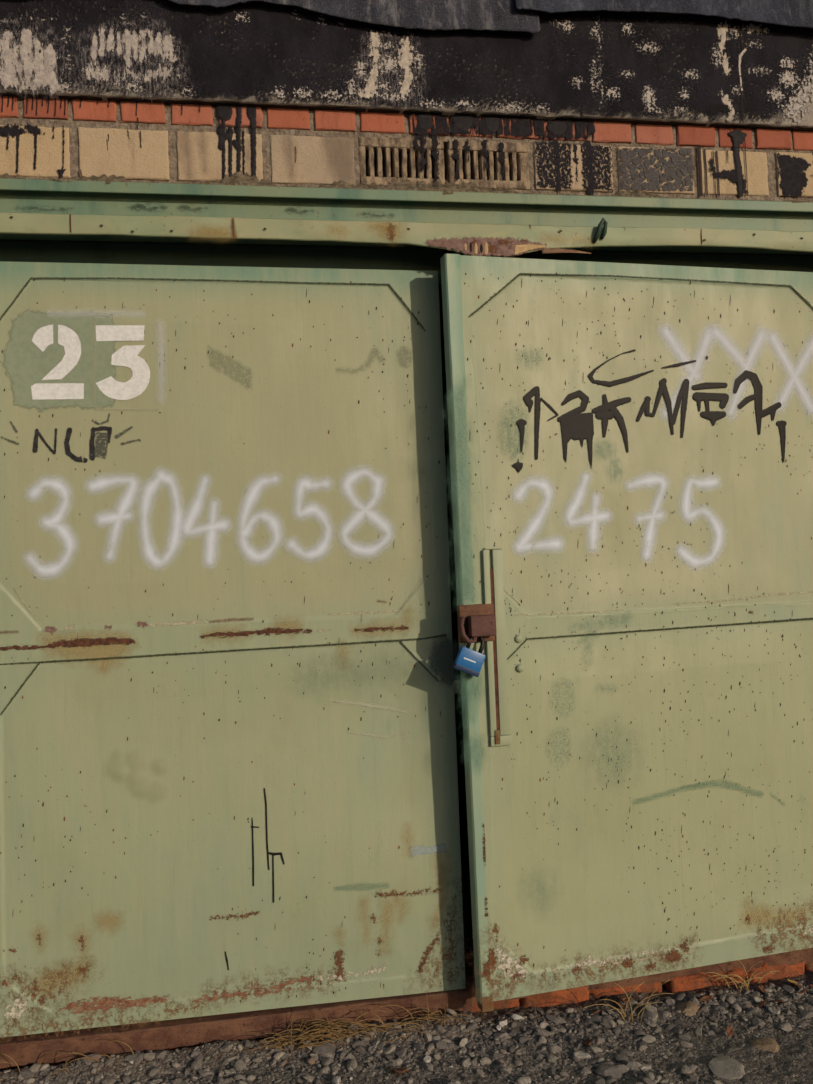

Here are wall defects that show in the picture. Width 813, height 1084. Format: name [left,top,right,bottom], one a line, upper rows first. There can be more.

peeling [0,13,196,97]
peeling [271,31,426,103]
spalling [711,20,770,75]
peeling [744,45,813,125]
damp [1,96,66,173]
damp [216,110,257,179]
damp [452,139,505,181]
damp [697,129,748,197]
rust [200,619,312,639]
rust [0,937,386,1038]
rust [480,897,529,1004]
rust [540,940,695,986]